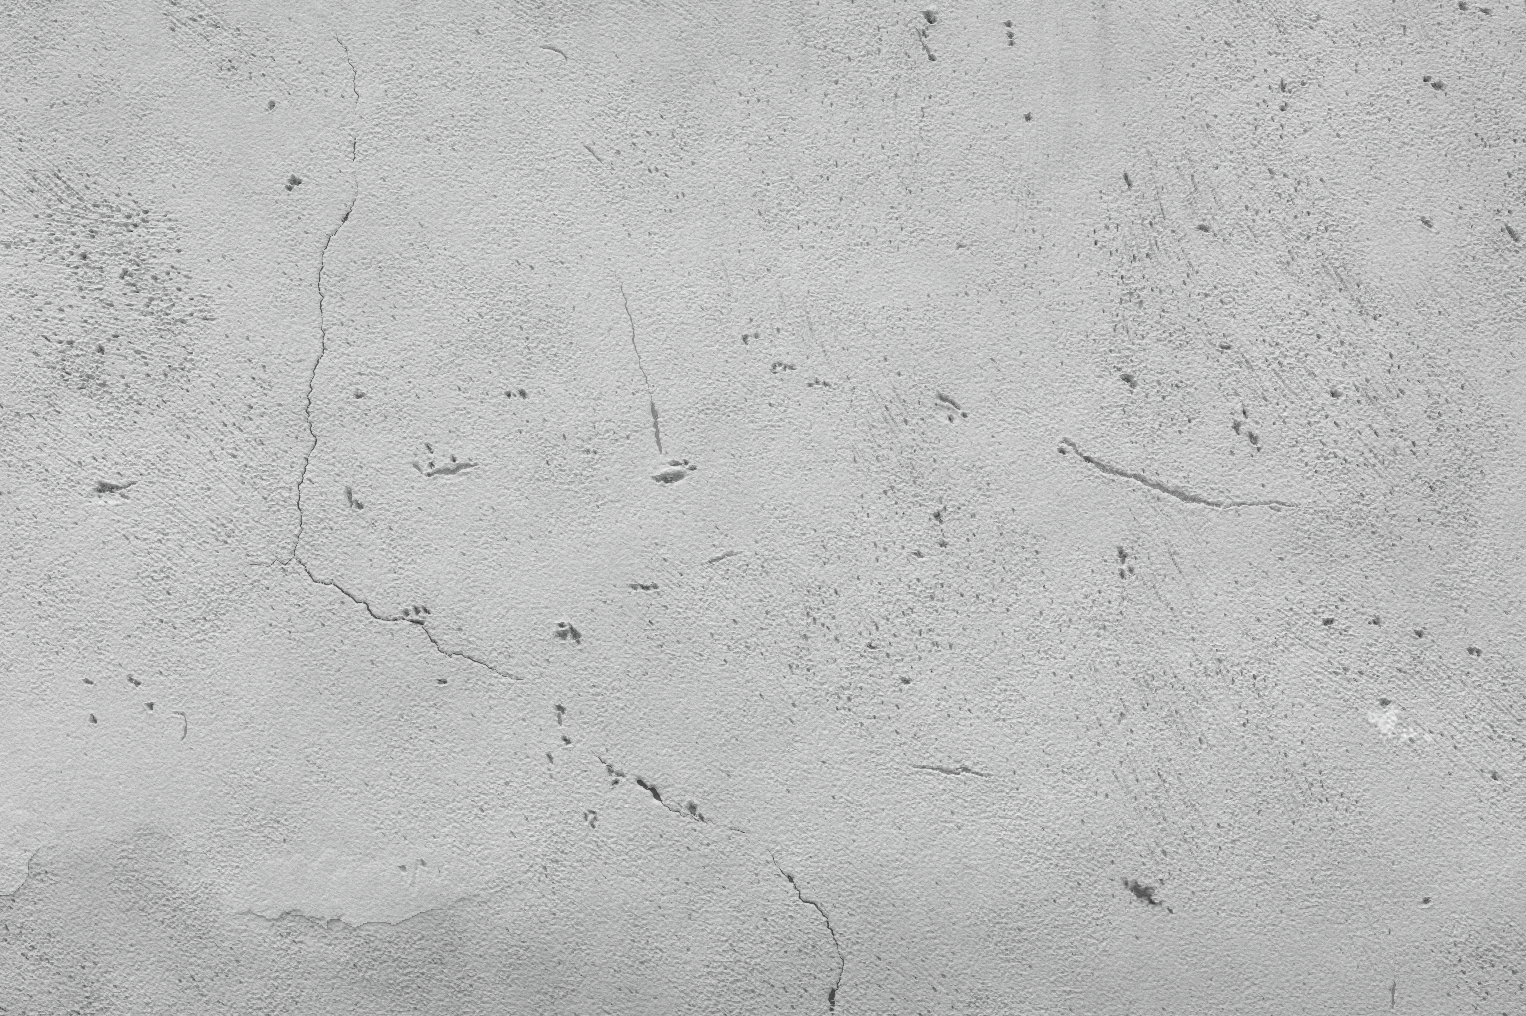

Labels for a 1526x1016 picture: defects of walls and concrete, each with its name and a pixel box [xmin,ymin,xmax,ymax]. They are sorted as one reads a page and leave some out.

crack [247,35,523,680]
crack [594,755,844,1015]